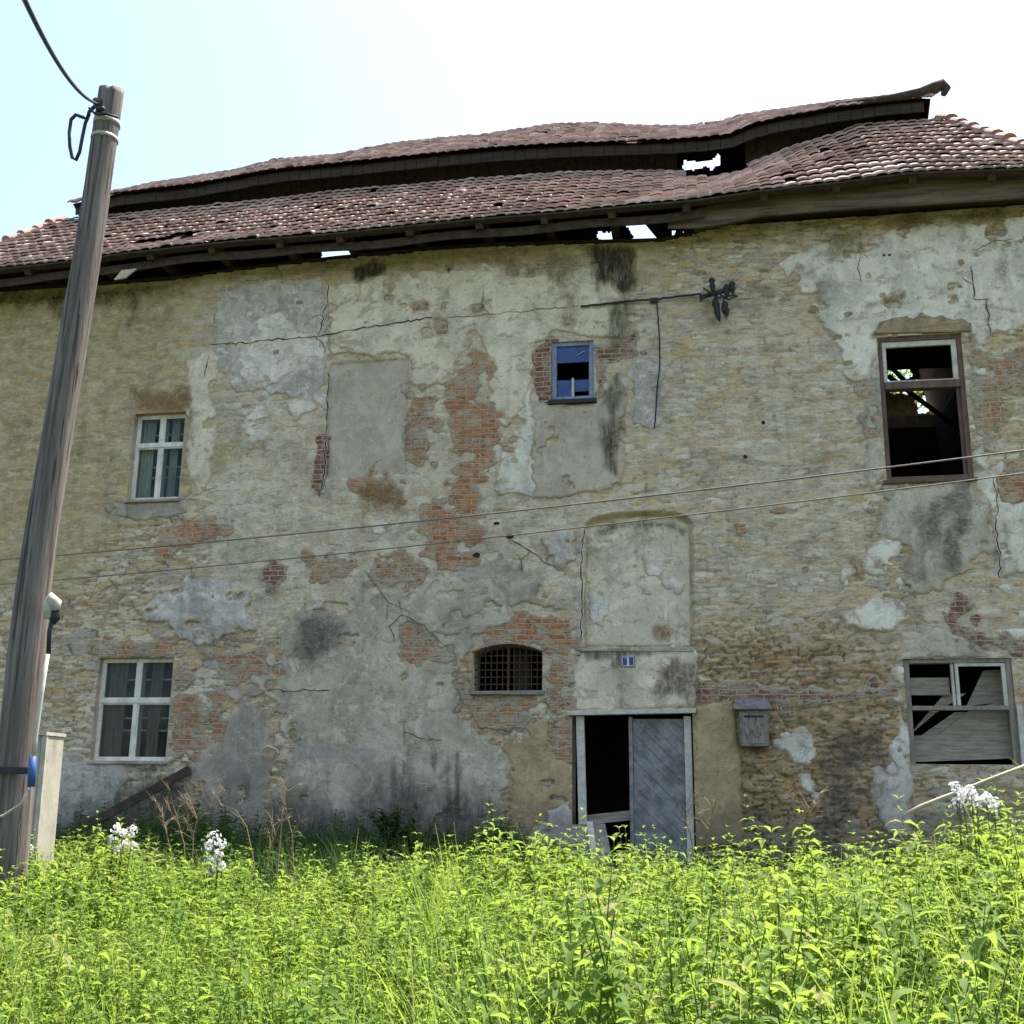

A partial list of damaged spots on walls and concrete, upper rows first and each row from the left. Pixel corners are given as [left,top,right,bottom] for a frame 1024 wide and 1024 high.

water stain [591,246,635,339]
crack [962,239,1013,335]
crack [204,284,578,497]
water stain [603,379,621,465]
flaking render [94,216,1024,852]
water stain [928,489,966,565]
crack [993,478,1002,578]
crack [367,572,443,644]
crack [512,528,586,641]